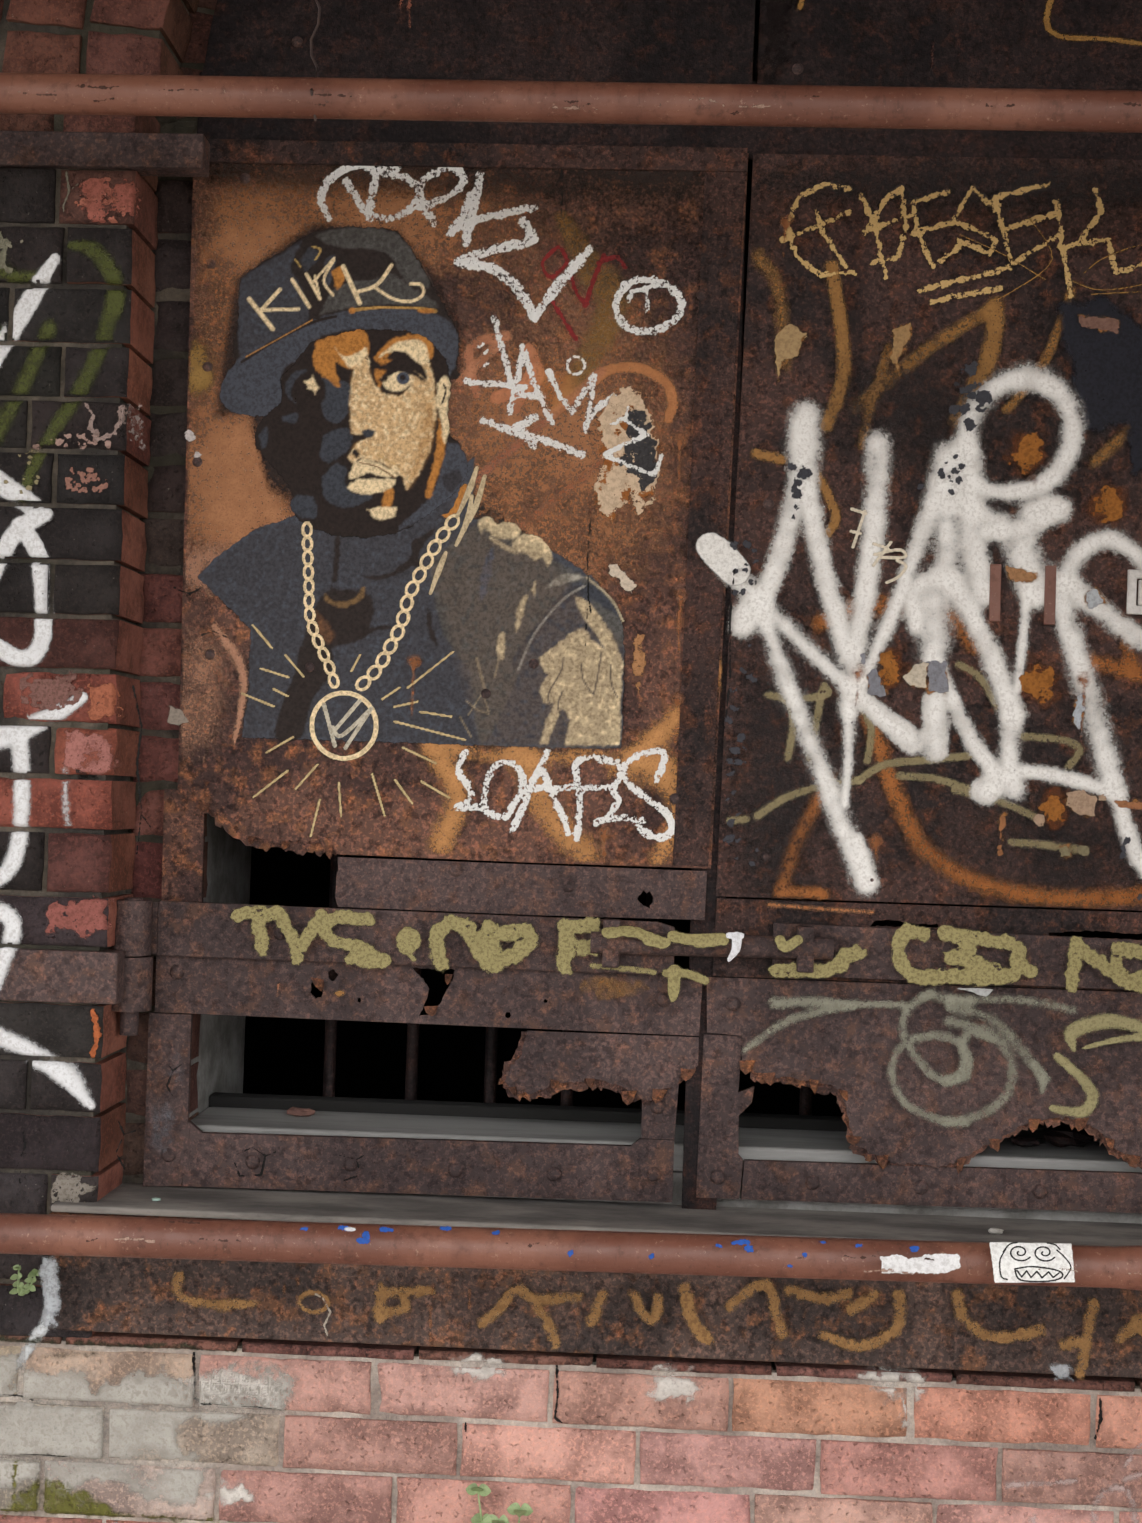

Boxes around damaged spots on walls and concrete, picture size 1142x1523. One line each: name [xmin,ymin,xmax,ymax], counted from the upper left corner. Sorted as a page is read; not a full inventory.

rust [186,165,688,597]
rust [820,261,1005,449]
rust [1036,288,1075,371]
rust [751,448,787,464]
rust [816,470,841,539]
rust [1003,432,1045,475]
rust [1087,484,1128,528]
rust [845,593,904,622]
rust [182,621,248,758]
rust [421,694,682,866]
rust [767,772,874,914]
rust [854,637,1142,909]